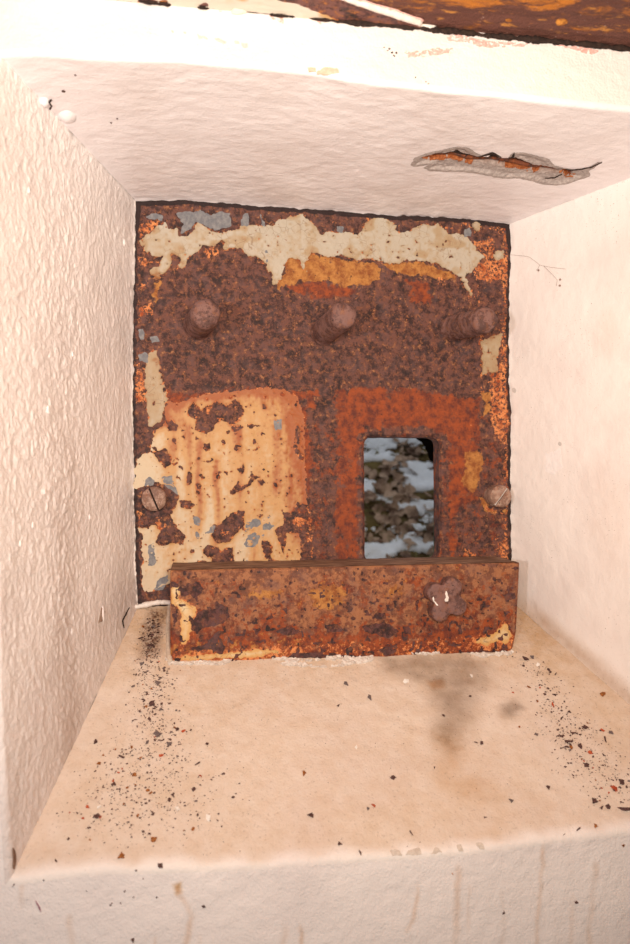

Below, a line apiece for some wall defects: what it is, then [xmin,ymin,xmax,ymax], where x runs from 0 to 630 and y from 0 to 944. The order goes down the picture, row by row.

spalling [411,147,602,186]
rust [146,566,517,661]